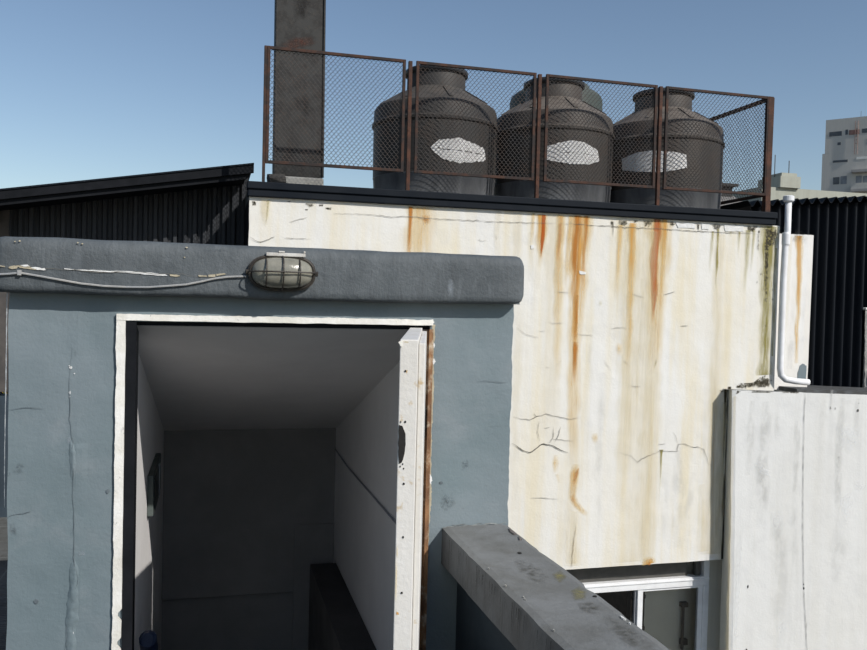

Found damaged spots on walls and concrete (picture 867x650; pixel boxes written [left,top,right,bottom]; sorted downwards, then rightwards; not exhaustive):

rust [409,206,428,244]
rust [538,214,546,254]
rust [650,219,667,313]
rust [556,215,588,368]
spalling [398,421,406,470]
crack [512,414,581,453]
crack [629,403,716,506]